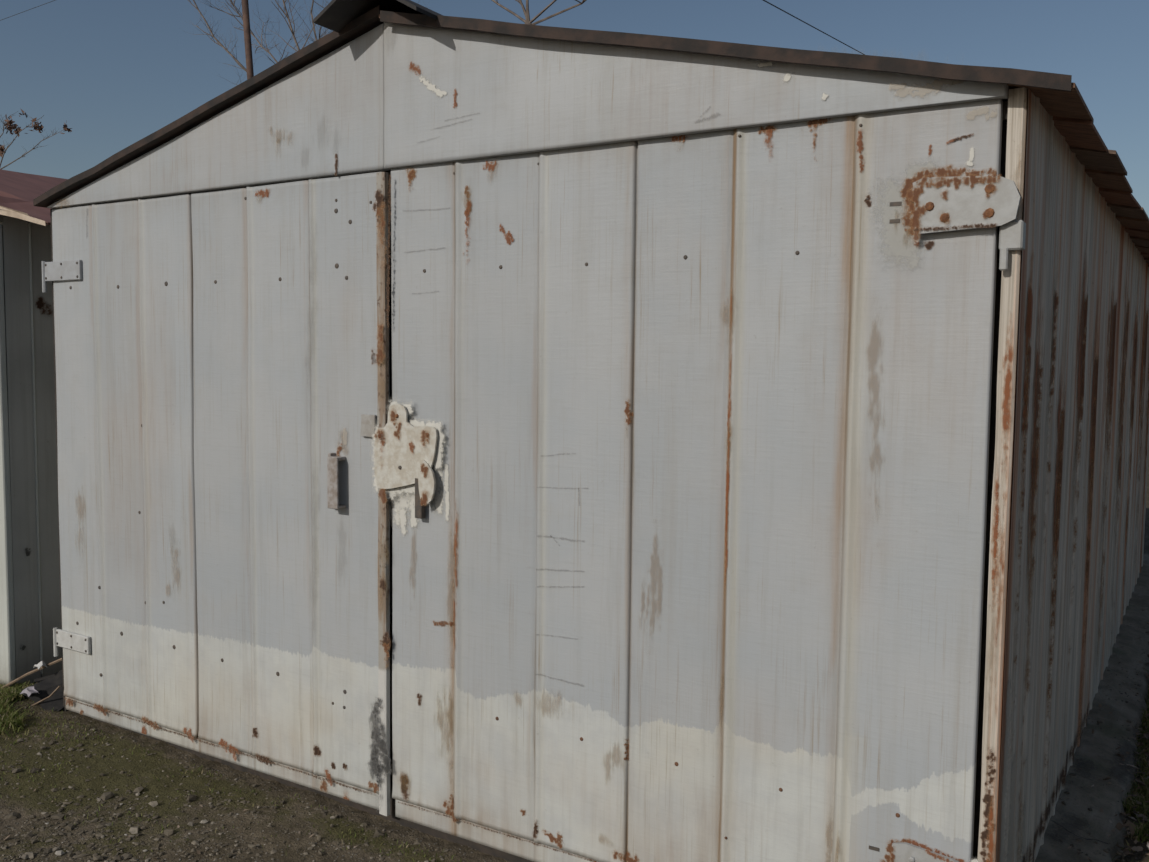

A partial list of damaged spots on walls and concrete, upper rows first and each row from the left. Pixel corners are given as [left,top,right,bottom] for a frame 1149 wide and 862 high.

rust [464,186,472,251]
rust [901,165,1000,249]
rust [371,176,391,365]
peeling [372,424,419,535]
peeling [389,400,450,521]
rust [1002,268,1149,665]
water stain [372,704,381,743]
rust [400,775,425,810]
rust [443,795,596,862]
rust [613,852,639,862]
rust [882,839,964,862]
rust [980,753,996,862]